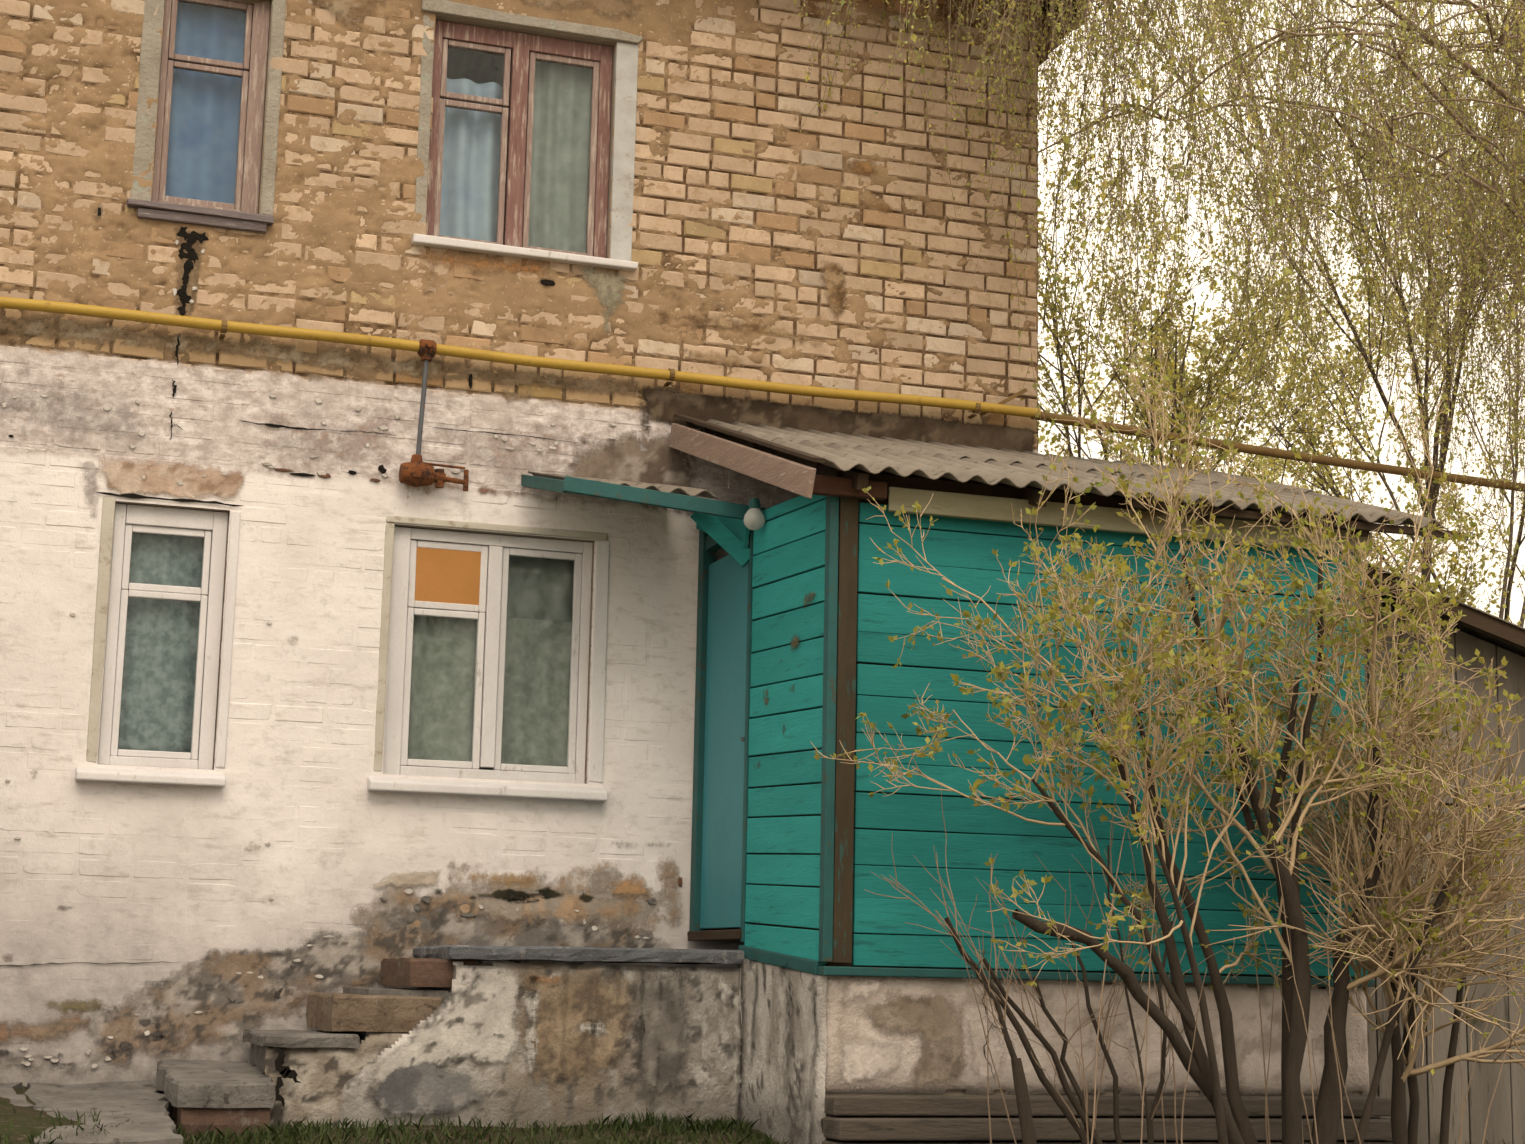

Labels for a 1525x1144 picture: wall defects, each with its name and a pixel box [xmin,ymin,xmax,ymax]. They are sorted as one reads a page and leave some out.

spalling [822,262,847,316]
spalling [657,310,818,345]
spalling [0,369,243,516]
peeling [262,395,400,482]
crack [0,955,179,967]
spalling [0,861,682,1116]
peeling [843,982,880,1001]
peeling [841,1039,902,1082]
peeling [968,1014,1004,1080]